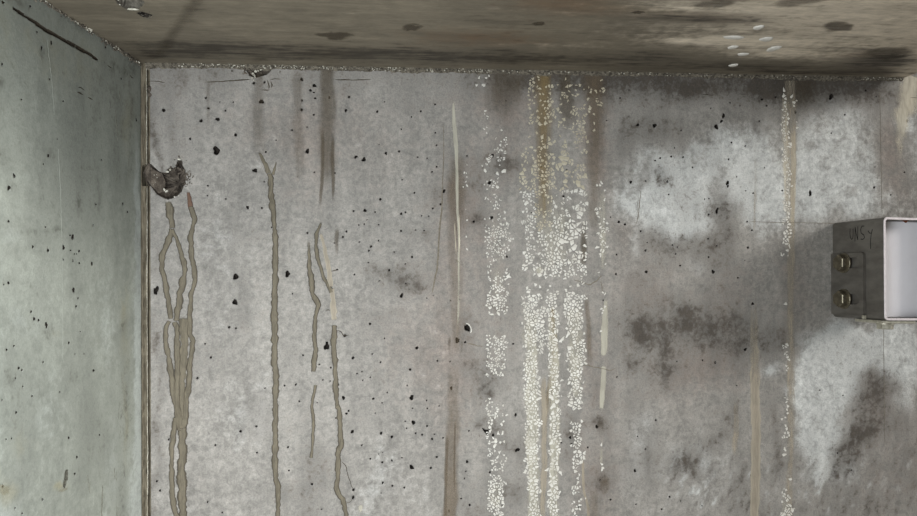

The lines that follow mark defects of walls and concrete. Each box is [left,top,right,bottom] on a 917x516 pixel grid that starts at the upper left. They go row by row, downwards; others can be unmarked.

spalling [143,155,194,200]
damp [482,110,514,316]
damp [780,84,799,270]
damp [485,398,508,516]
damp [486,335,509,376]
damp [519,76,609,516]
damp [781,302,793,466]
damp [780,478,795,516]